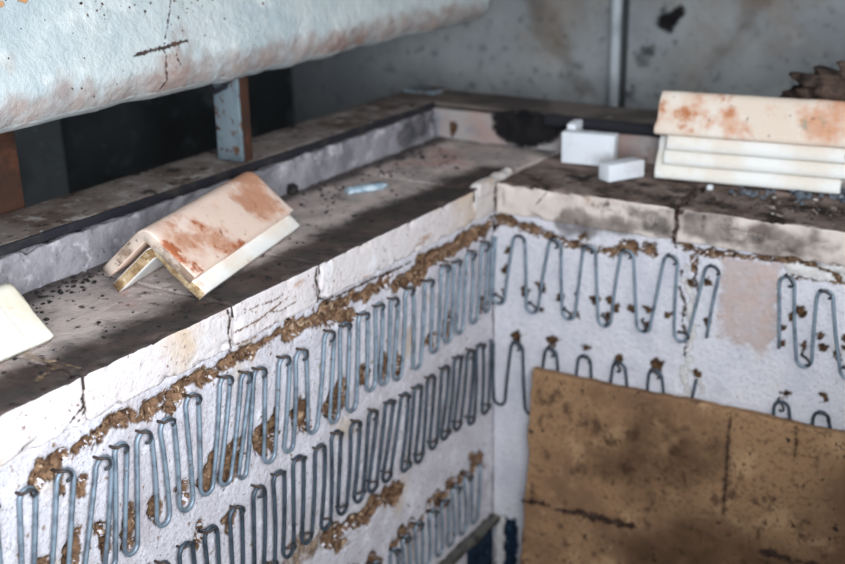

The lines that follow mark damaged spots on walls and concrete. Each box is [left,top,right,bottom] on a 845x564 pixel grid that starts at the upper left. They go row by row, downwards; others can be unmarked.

crack [134,0,188,89]
crack [672,189,705,397]
spalling [671,238,845,285]
crack [24,353,86,423]
spalling [27,213,658,505]
spalling [61,525,82,564]
spalling [92,501,135,562]
spalling [146,495,163,525]
spalling [220,509,237,535]
spalling [287,479,404,564]
spalling [389,450,485,556]
peeling [467,515,519,564]